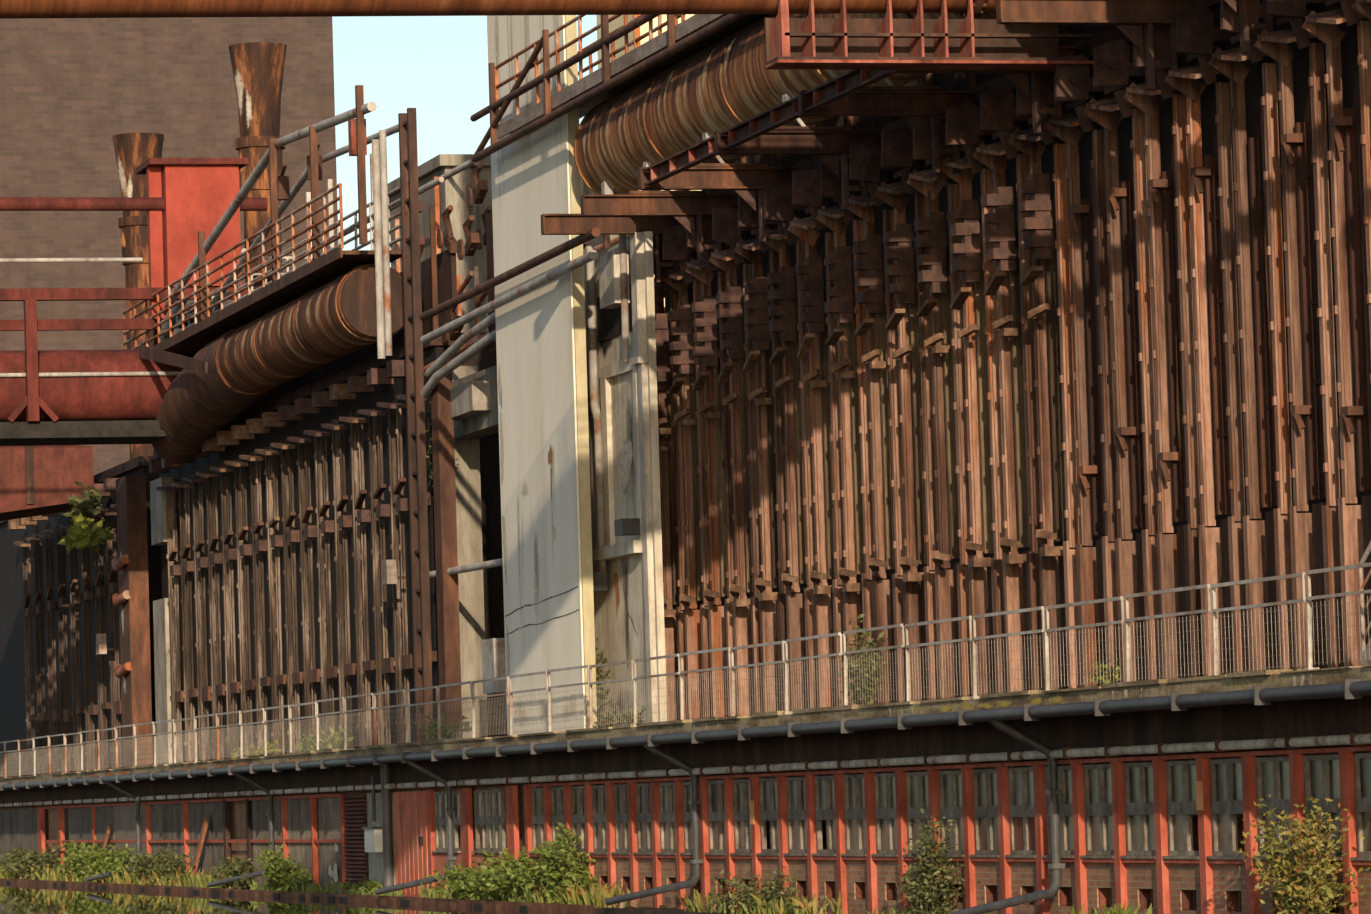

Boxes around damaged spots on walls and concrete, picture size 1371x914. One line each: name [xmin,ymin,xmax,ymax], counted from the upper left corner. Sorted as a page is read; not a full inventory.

crack [505,586,579,635]
crack [619,567,637,652]